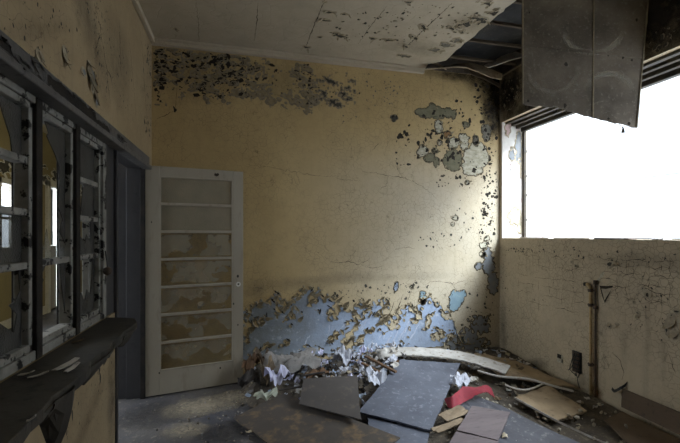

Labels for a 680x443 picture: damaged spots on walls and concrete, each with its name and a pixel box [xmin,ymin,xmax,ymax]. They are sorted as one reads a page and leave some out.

peeling [0,27,127,144]
mould [153,49,277,102]
peeling [243,76,523,361]
crack [601,257,676,305]